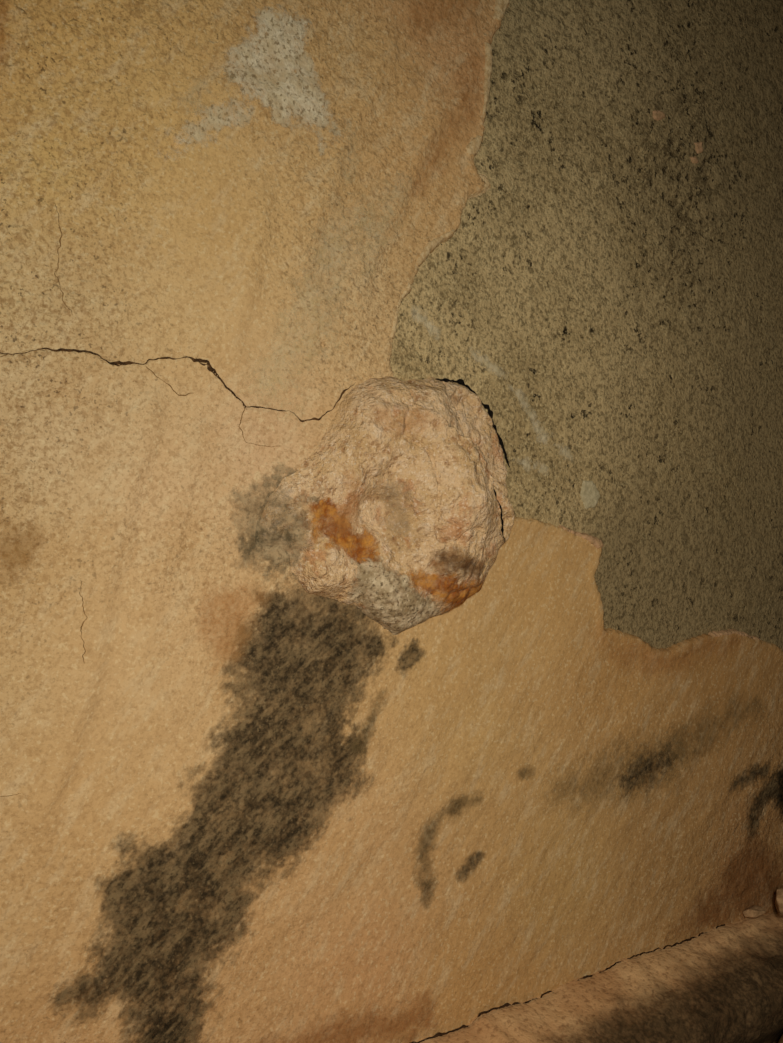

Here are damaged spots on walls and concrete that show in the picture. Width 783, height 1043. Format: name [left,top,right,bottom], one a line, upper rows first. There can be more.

spalling [389,0,783,651]
crack [0,347,355,447]
water stain [234,466,310,576]
rust [311,498,380,563]
spalling [350,557,447,635]
rust [411,551,485,612]
water stain [397,640,424,670]
water stain [56,588,395,1043]
water stain [459,852,482,878]
water stain [730,763,783,909]
crack [578,924,725,980]
crack [411,991,552,1043]